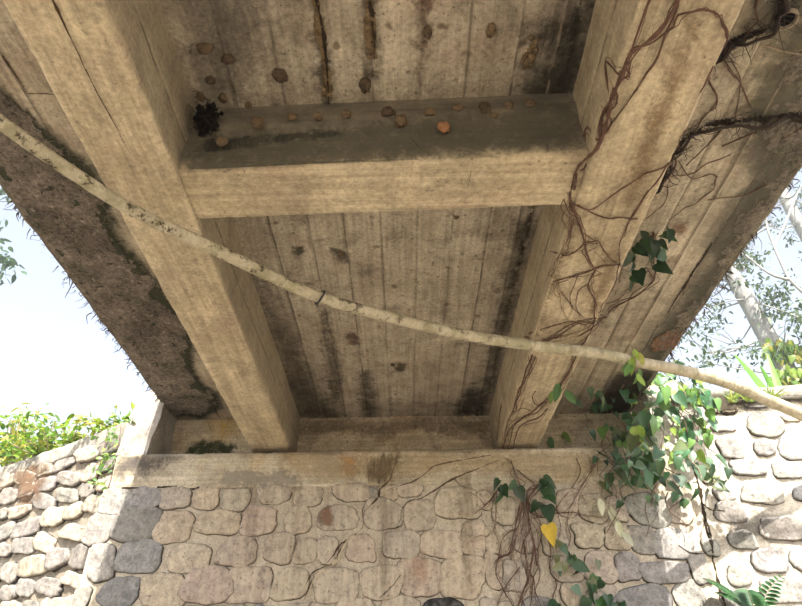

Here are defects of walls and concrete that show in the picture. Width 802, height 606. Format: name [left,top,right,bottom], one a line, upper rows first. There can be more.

crack [51,0,130,153]
crack [315,0,329,99]
crack [368,0,376,60]
damp [529,0,596,94]
damp [1,89,105,186]
damp [191,104,579,170]
damp [90,202,222,419]
damp [457,348,500,417]
damp [493,223,530,335]
spalling [651,328,682,351]
crack [302,455,499,606]
crack [678,472,726,606]